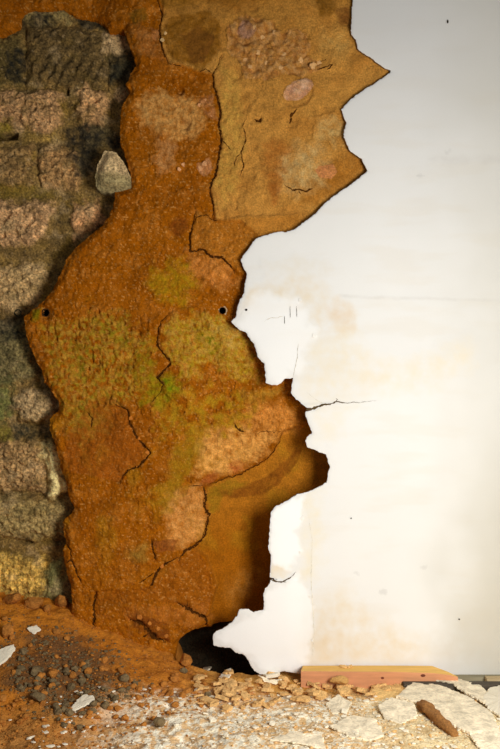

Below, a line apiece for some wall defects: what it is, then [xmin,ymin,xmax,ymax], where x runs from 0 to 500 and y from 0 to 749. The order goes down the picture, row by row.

flaking render [226,14,322,101]
flaking render [196,157,213,177]
crack [157,0,262,274]
flaking render [61,396,150,483]
crack [115,403,151,484]
crack [152,317,171,402]
peeling [235,288,322,384]
crack [306,393,370,411]
crack [139,423,282,586]
flaking render [126,610,171,642]
crack [178,602,208,625]
peeling [215,494,316,685]